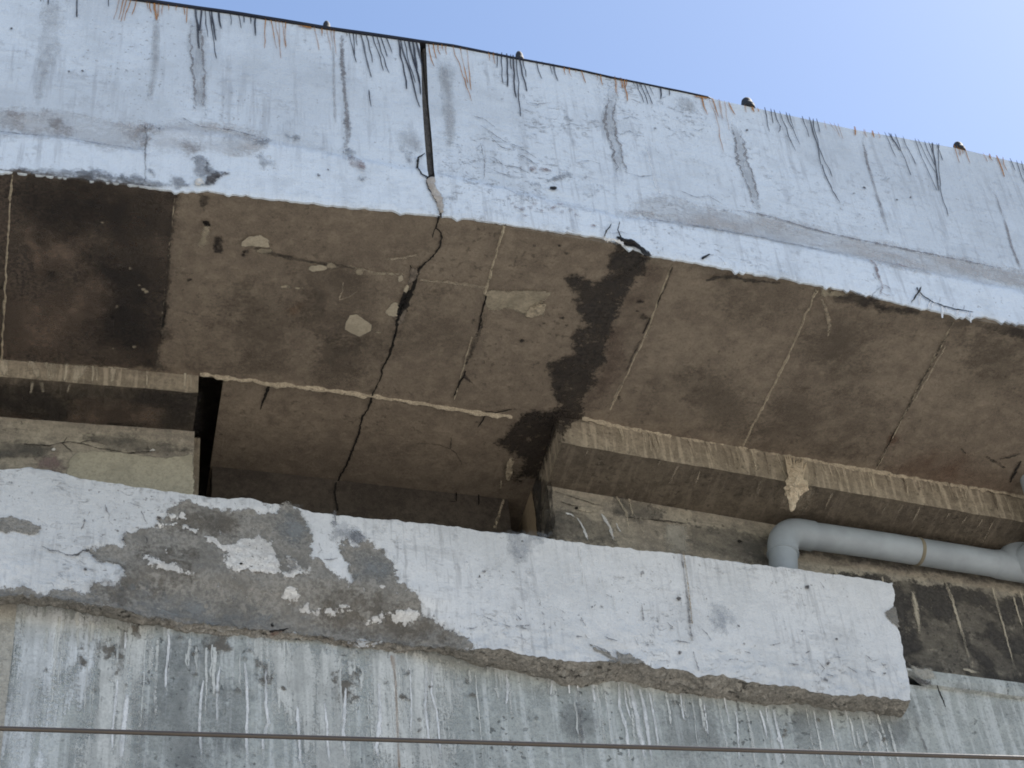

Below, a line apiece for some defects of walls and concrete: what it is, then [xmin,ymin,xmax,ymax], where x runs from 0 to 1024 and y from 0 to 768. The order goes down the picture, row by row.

rust [119,0,188,23]
rust [428,43,471,98]
spalling [241,235,272,257]
spalling [345,314,381,337]
crack [259,153,487,511]
damp [493,239,650,536]
peeling [0,499,473,655]
damp [0,606,170,768]
damp [185,638,220,753]
damp [248,637,484,768]
spalling [590,644,650,666]
damp [592,682,708,758]